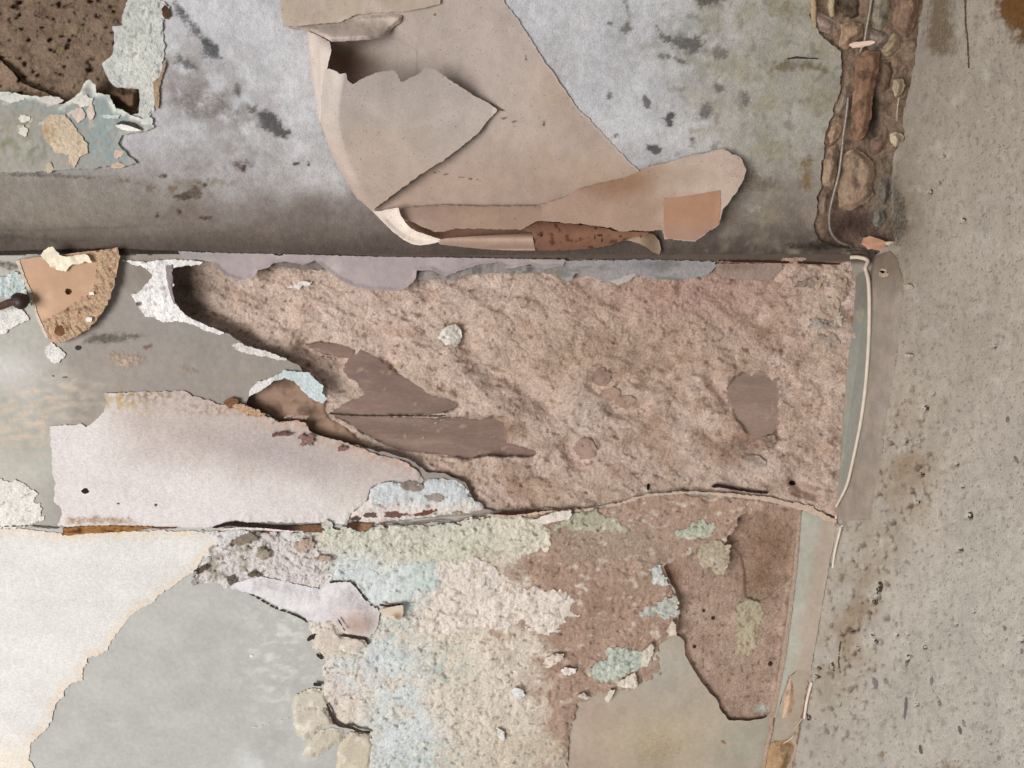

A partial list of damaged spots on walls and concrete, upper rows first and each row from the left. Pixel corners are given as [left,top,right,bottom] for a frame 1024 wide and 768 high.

flaking render [0,0,171,173]
spalling [809,0,923,254]
peeling [0,271,31,335]
flaking render [123,251,856,768]
crack [711,484,768,494]